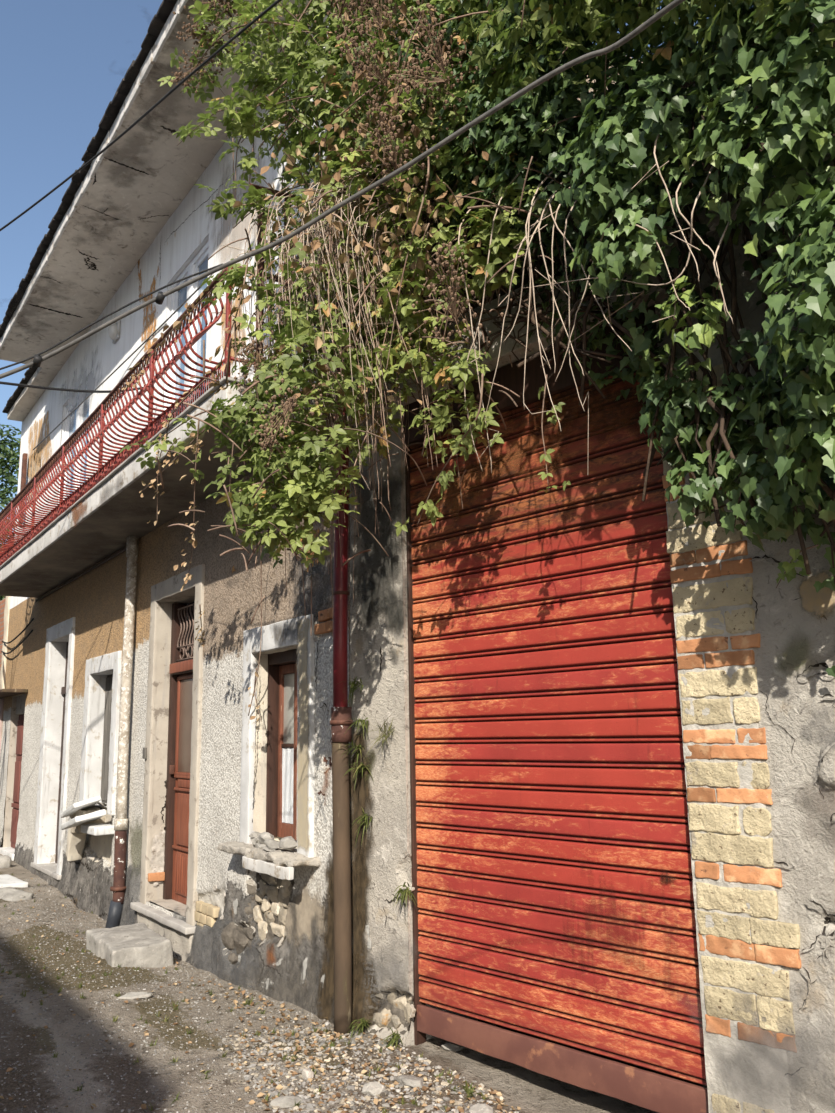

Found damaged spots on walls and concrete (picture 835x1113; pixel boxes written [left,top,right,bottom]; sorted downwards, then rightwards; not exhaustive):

peeling [138,259,159,360]
peeling [27,412,52,486]
water stain [351,474,408,630]
crack [761,691,799,752]
crack [796,662,835,824]
crack [772,861,795,869]
flaking render [194,885,226,927]
crack [799,898,835,1010]
flaking render [368,986,416,1041]